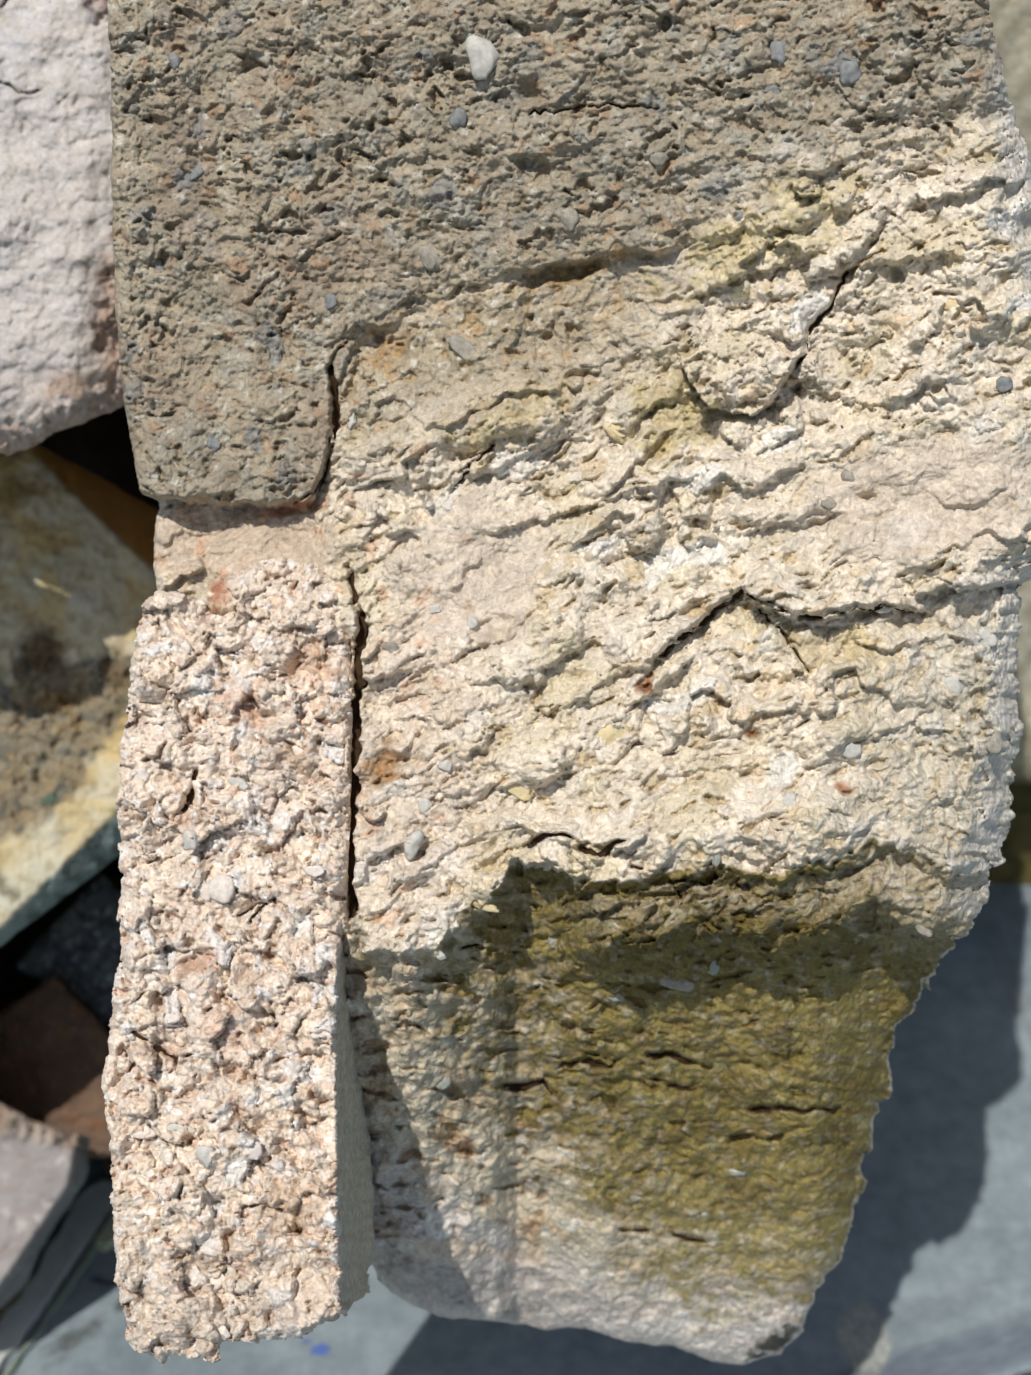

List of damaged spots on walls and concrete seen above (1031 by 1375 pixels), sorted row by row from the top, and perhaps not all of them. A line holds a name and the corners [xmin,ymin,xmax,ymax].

crack [148,128,1031,957]
water stain [389,1269,558,1313]
water stain [419,841,955,1320]
water stain [837,1304,891,1372]